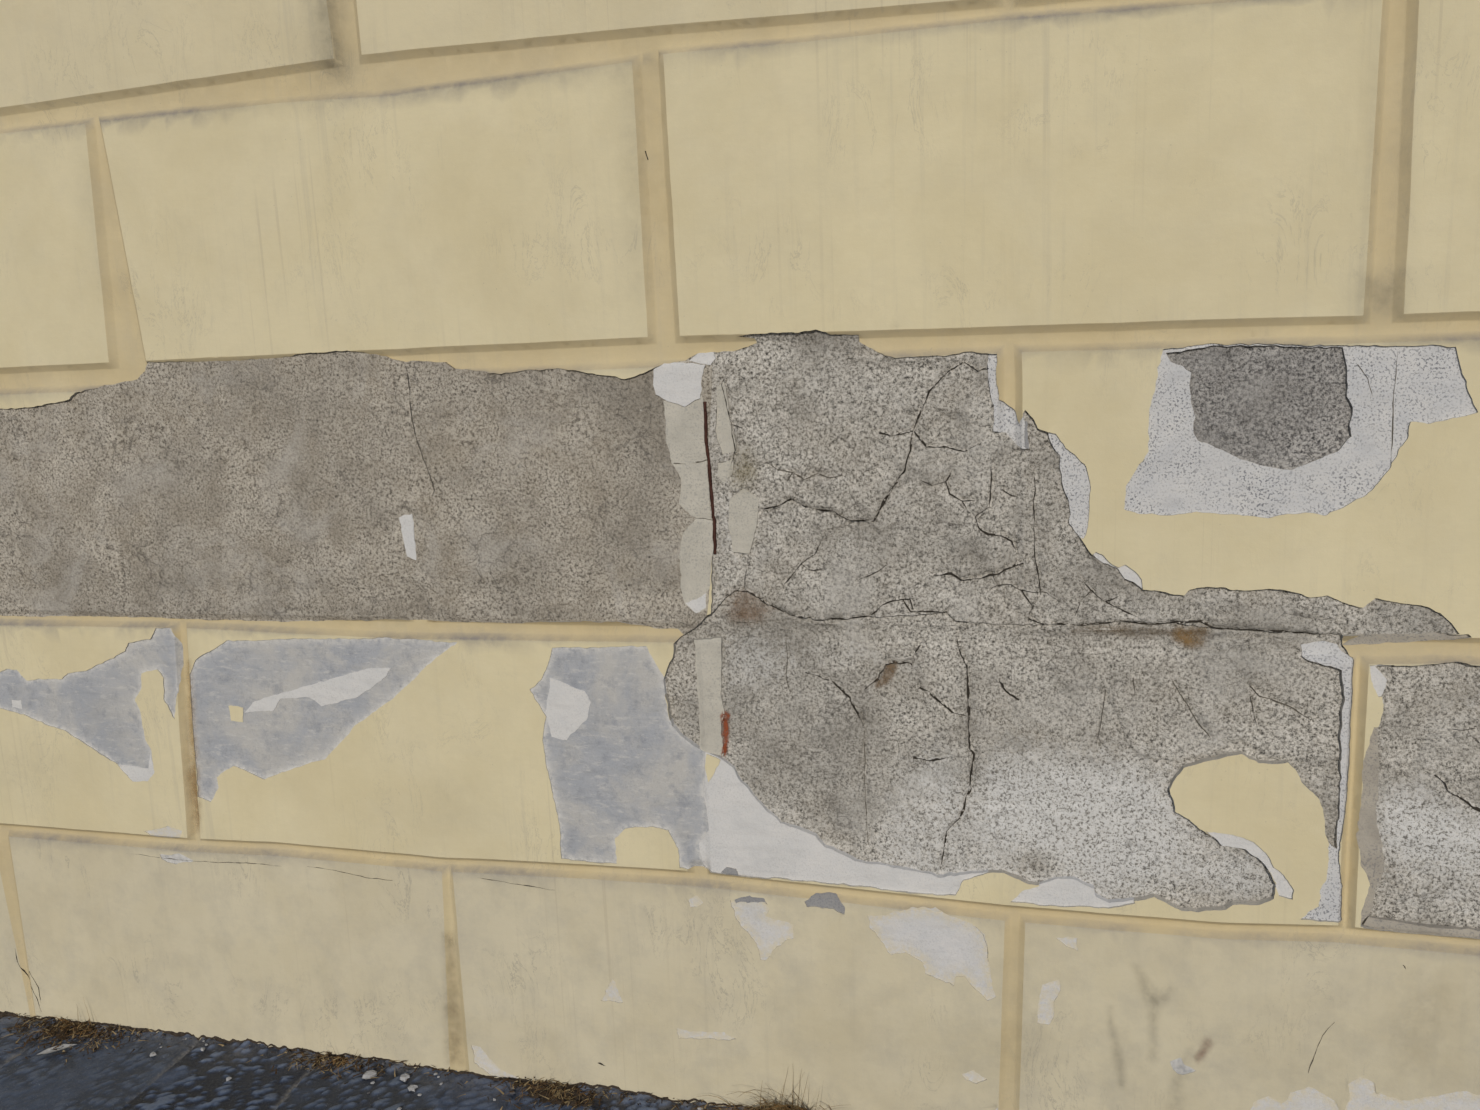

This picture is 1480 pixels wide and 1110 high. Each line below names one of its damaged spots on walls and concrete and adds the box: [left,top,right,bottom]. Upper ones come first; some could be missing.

crack [673,362,1332,869]
spalling [0,343,1480,1002]
rust [721,712,730,756]
crack [1435,775,1480,812]
peeling [1037,979,1061,1024]
peeling [1251,1077,1480,1110]